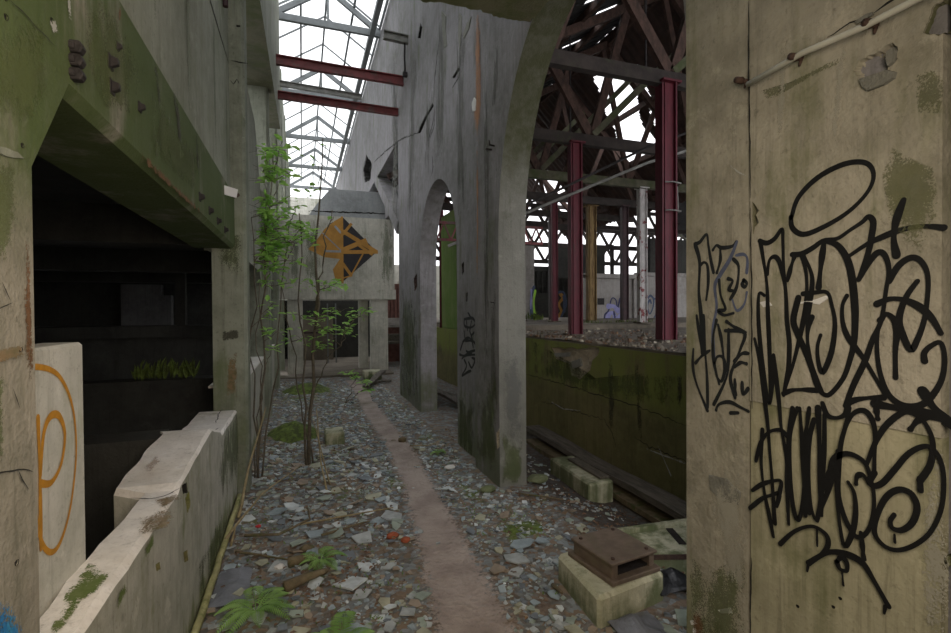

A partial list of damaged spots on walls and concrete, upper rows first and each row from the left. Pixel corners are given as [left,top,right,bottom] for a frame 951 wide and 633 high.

spalling [853,42,898,92]
water stain [380,20,466,286]
water stain [0,163,17,259]
crack [746,3,754,386]
spalling [552,347,599,379]
spalling [182,482,191,513]
crack [747,557,755,633]